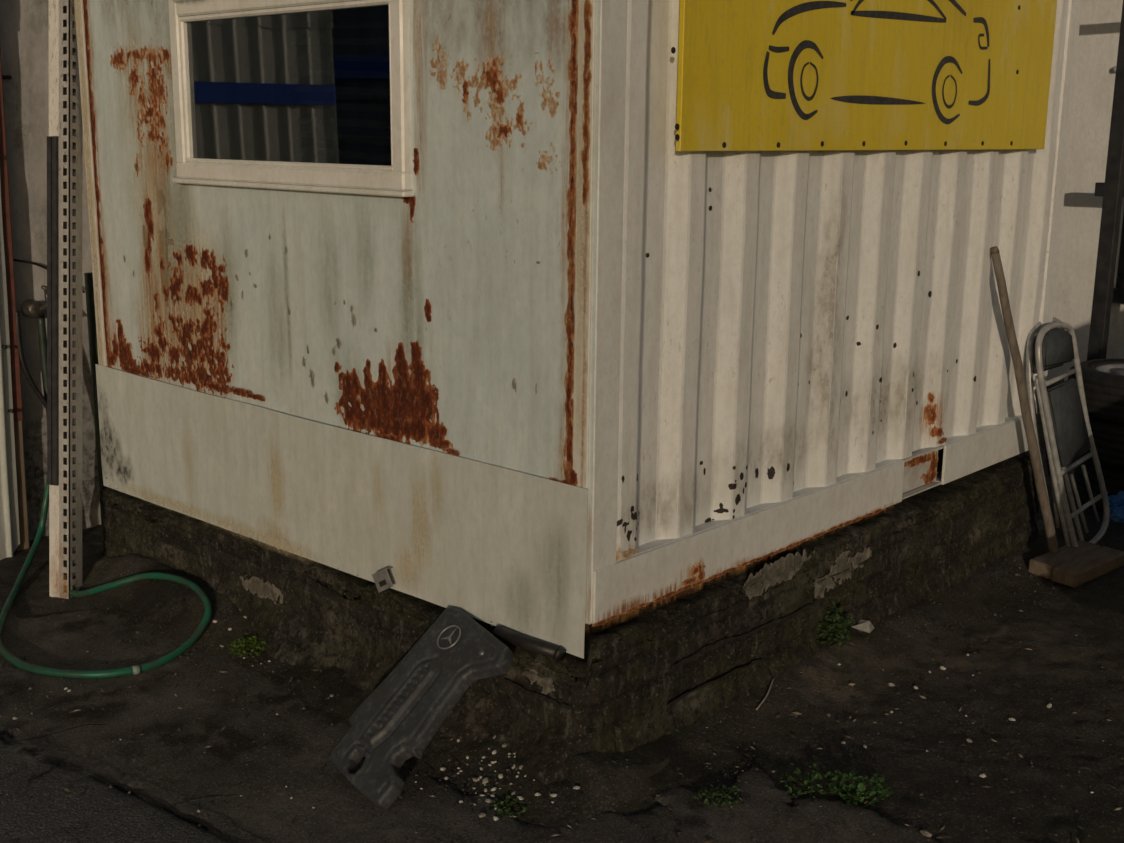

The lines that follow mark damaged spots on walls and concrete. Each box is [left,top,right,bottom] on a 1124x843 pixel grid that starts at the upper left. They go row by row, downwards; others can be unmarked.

corrosion [75,0,264,401]
corrosion [549,0,592,486]
corrosion [334,341,459,456]
peeling [617,506,639,541]
corrosion [592,507,886,627]
peeling [705,463,794,523]
spalling [743,549,815,600]
spalling [813,547,872,598]
corrosion [904,392,947,484]
crack [0,707,239,843]